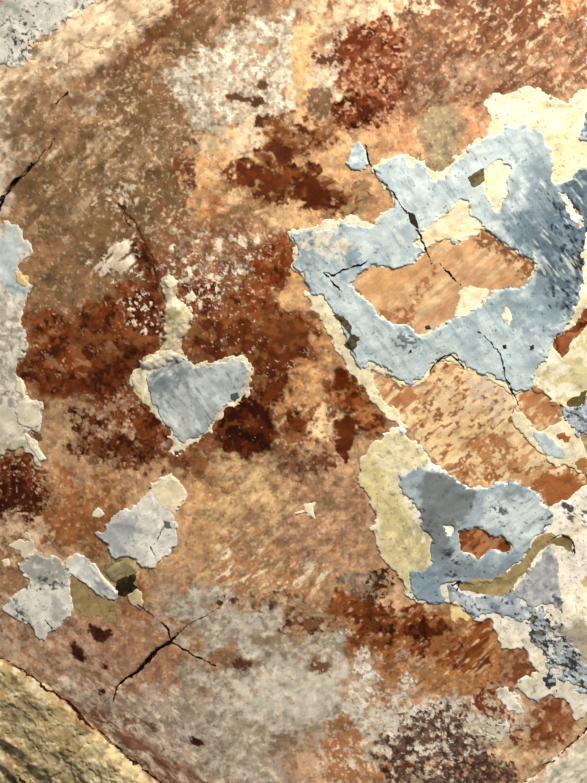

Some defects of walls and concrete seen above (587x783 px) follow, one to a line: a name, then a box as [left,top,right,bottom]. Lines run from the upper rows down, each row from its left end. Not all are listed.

crack [0,138,55,207]
peeling [0,0,159,100]
rust [218,7,415,222]
crack [323,260,367,291]
crack [365,144,461,285]
peeling [129,350,254,457]
rust [15,223,396,487]
peeling [287,86,587,742]
rust [0,450,56,528]
peeling [2,473,187,641]
crack [102,595,225,706]
rust [214,562,580,760]